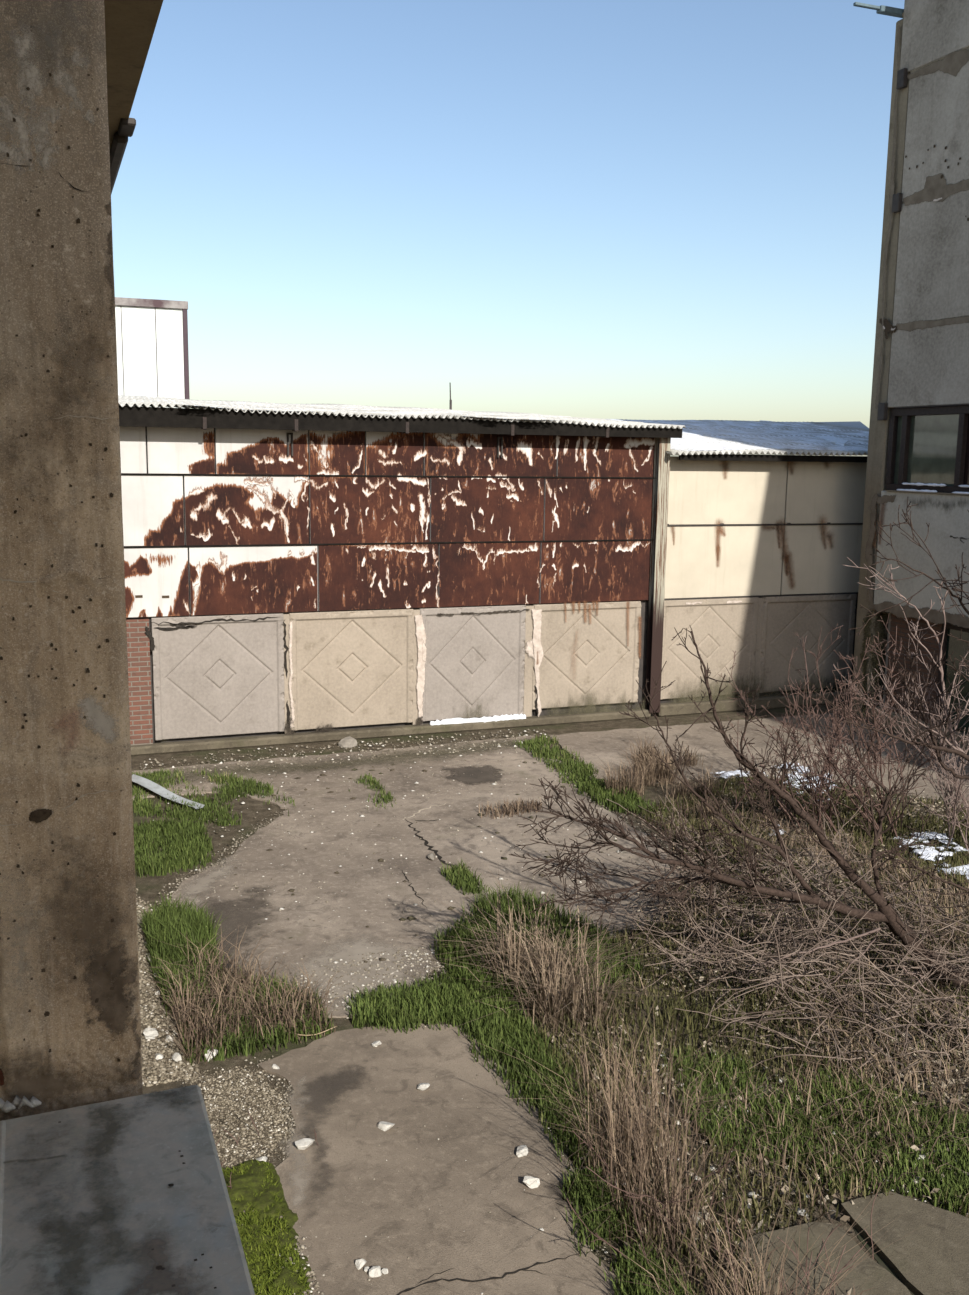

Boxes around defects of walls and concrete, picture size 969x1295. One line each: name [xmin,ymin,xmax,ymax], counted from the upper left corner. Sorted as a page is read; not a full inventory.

spalling [876,25,969,409]
corrosion [124,431,655,656]
corrosion [765,523,793,587]
crack [406,803,478,890]
leakage [1,1057,99,1111]
leakage [3,1106,193,1295]
crack [397,1252,586,1295]